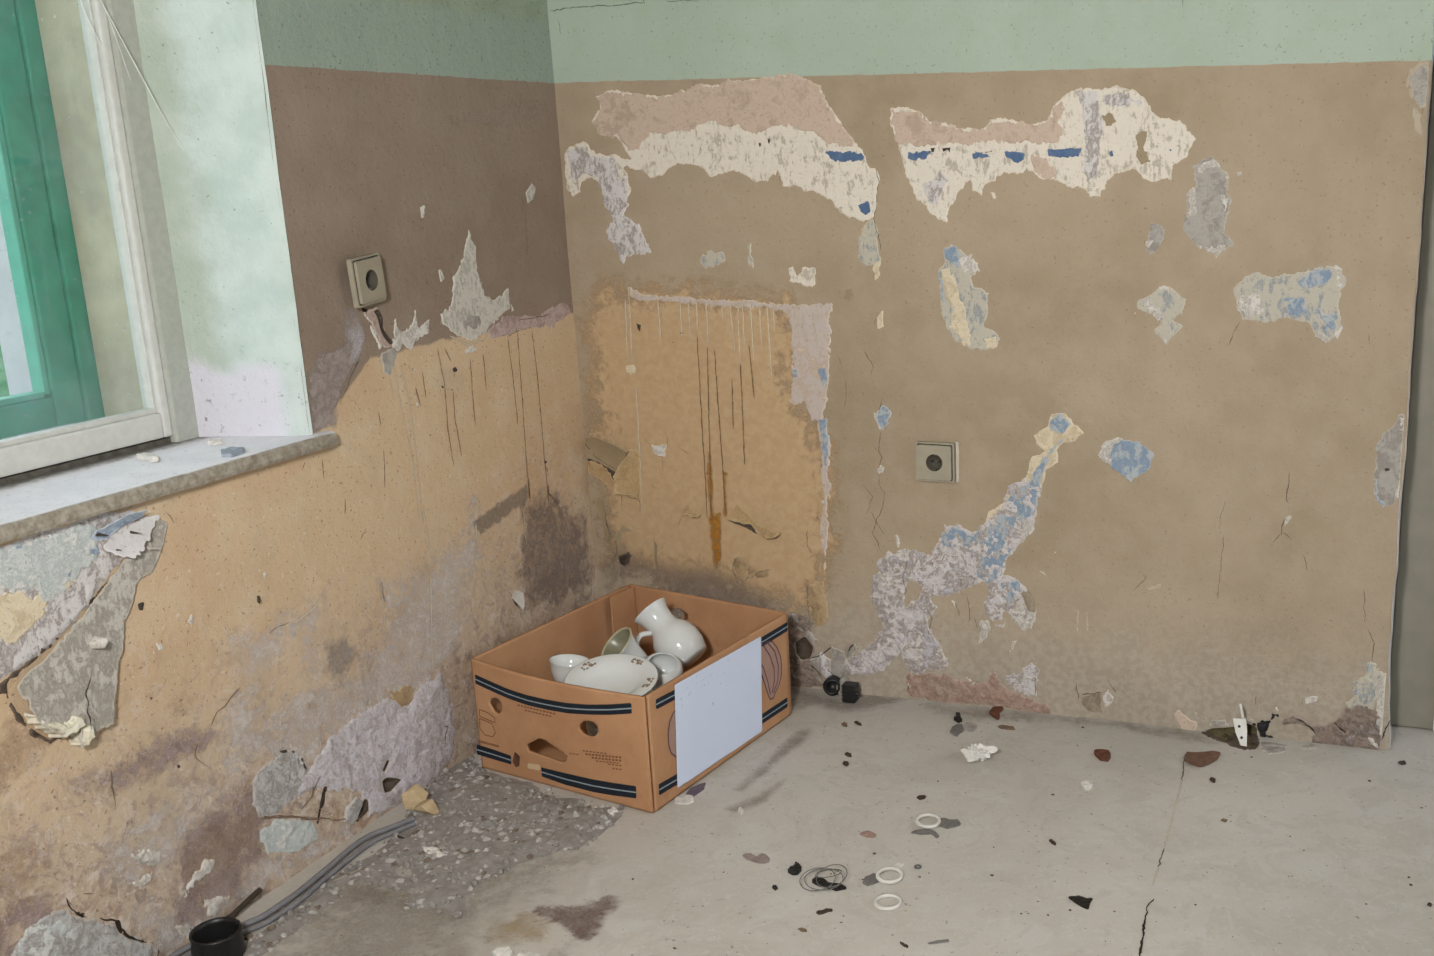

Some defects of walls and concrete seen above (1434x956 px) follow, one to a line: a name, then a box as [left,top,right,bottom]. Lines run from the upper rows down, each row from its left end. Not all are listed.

peeling [564,73,881,280]
peeling [890,85,1242,258]
peeling [381,230,514,522]
peeling [580,244,1084,688]
peeling [1098,437,1154,483]
peeling [1229,265,1346,345]
peeling [0,509,168,748]
damp [104,786,282,949]
spalling [252,749,368,854]
damp [101,333,589,817]
spalling [382,761,401,793]
spalling [1201,662,1390,755]